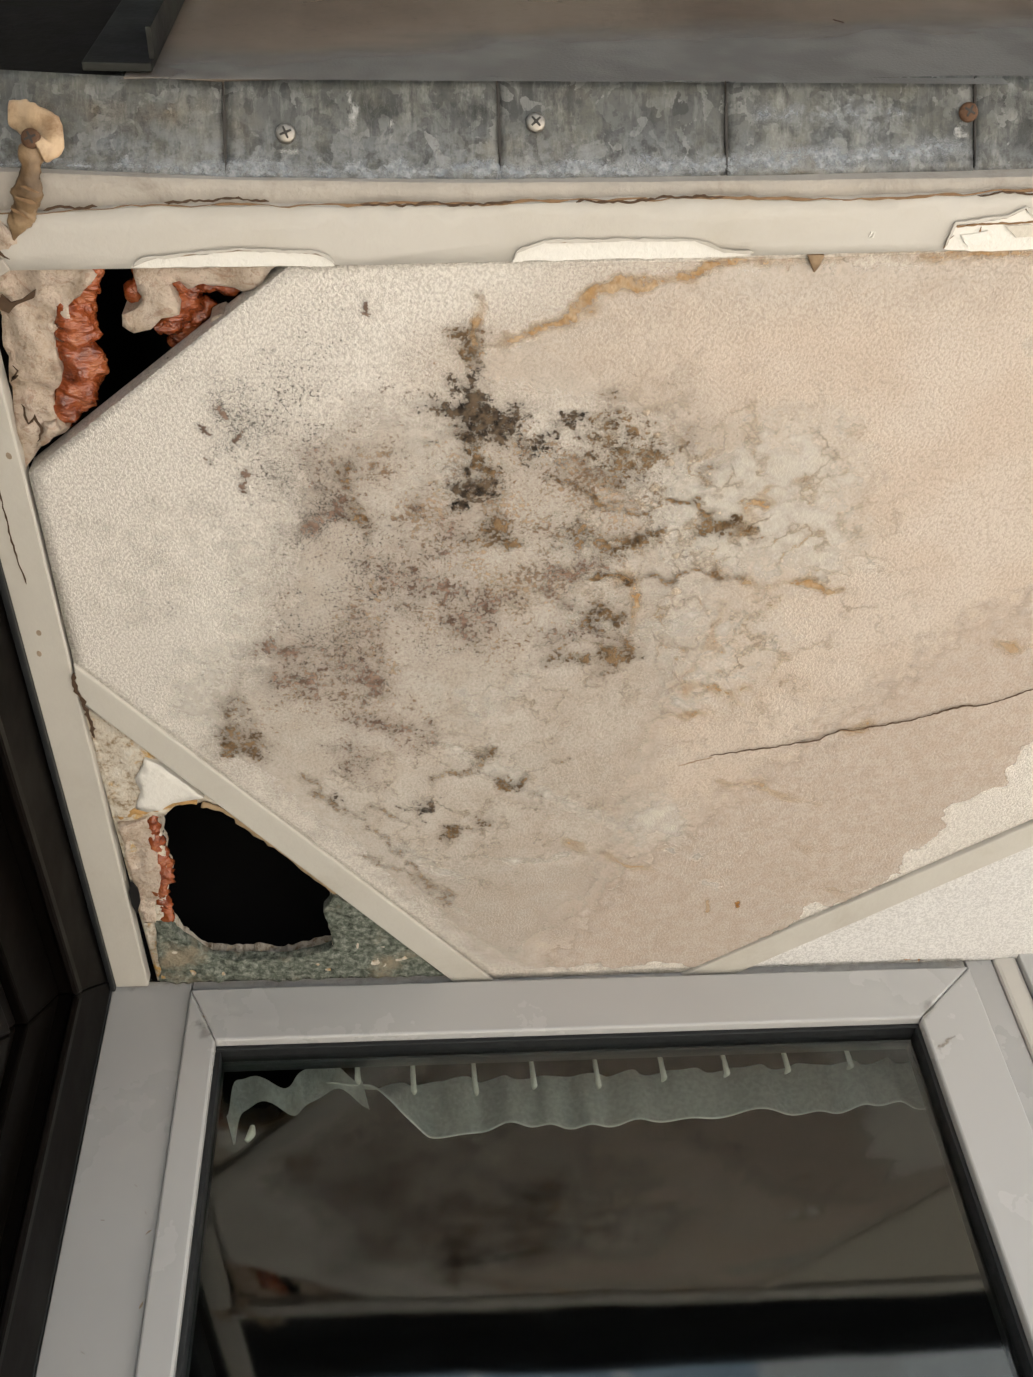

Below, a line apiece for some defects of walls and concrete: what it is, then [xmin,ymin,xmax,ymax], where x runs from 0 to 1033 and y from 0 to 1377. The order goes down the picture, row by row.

peeling [513,238,753,262]
peeling [943,206,1033,252]
spalling [0,221,110,468]
spalling [122,247,335,348]
leakage [205,250,1033,968]
crack [679,689,1033,766]
flaking render [135,757,204,812]
rust [117,800,336,894]